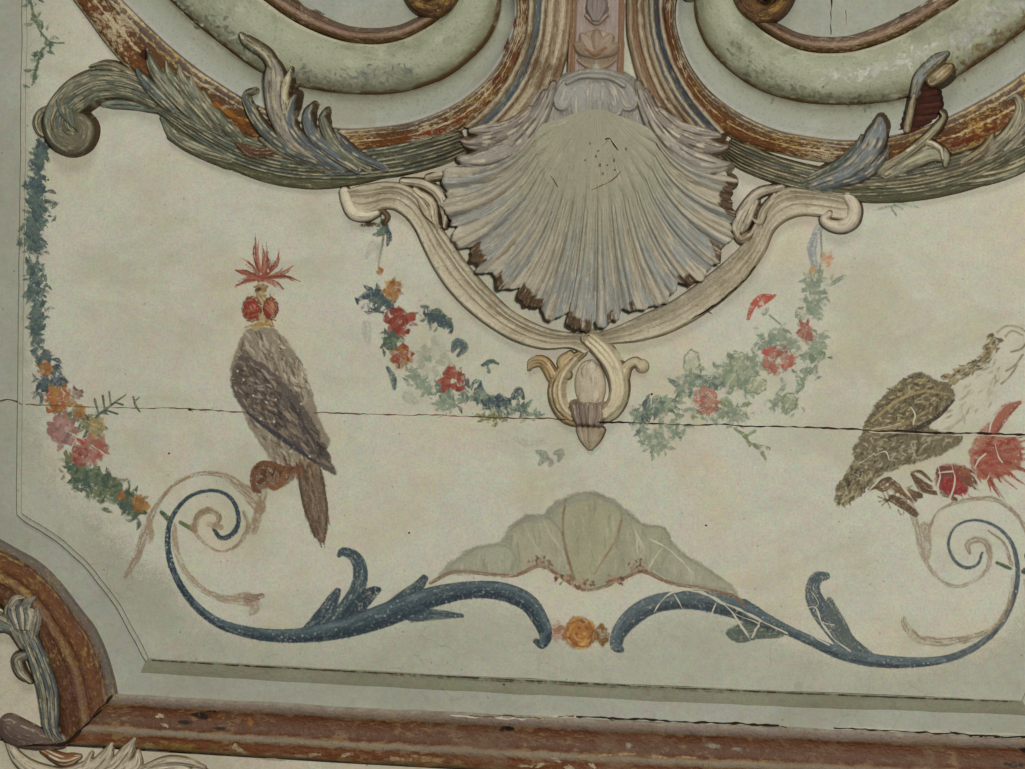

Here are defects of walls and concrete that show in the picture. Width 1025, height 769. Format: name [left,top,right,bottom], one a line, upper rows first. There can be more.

crack [0,398,87,407]
crack [113,406,244,414]
crack [314,412,1025,437]